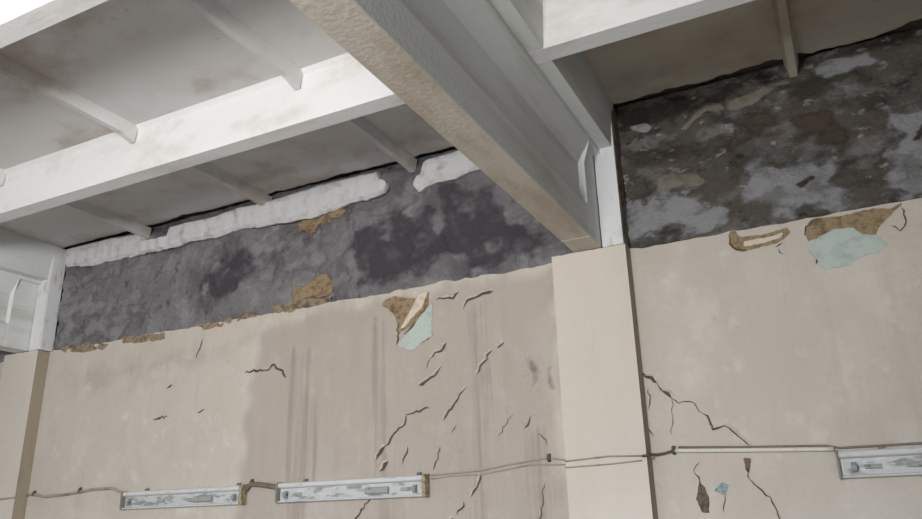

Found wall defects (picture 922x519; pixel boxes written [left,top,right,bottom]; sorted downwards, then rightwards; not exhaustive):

spalling [616,28,922,270]
spalling [52,149,574,352]
crack [436,289,493,308]
crack [374,340,504,471]
crack [498,415,547,443]
crack [643,373,752,446]
crack [449,473,482,519]
crack [747,474,780,519]